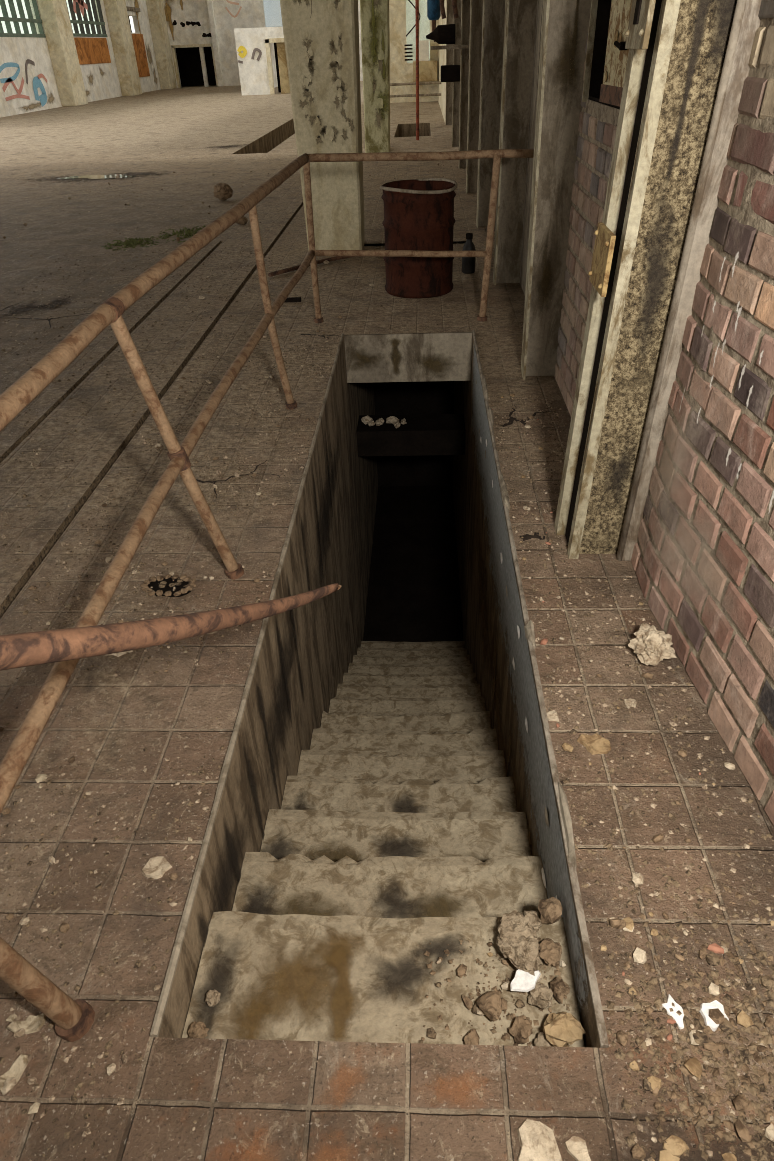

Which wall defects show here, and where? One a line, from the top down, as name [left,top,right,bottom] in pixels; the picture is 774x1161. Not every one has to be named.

leakage [371,0,386,79]
leakage [392,339,401,373]
leakage [419,357,450,373]
leakage [710,301,742,388]
leakage [739,351,764,406]
leakage [380,937,462,994]